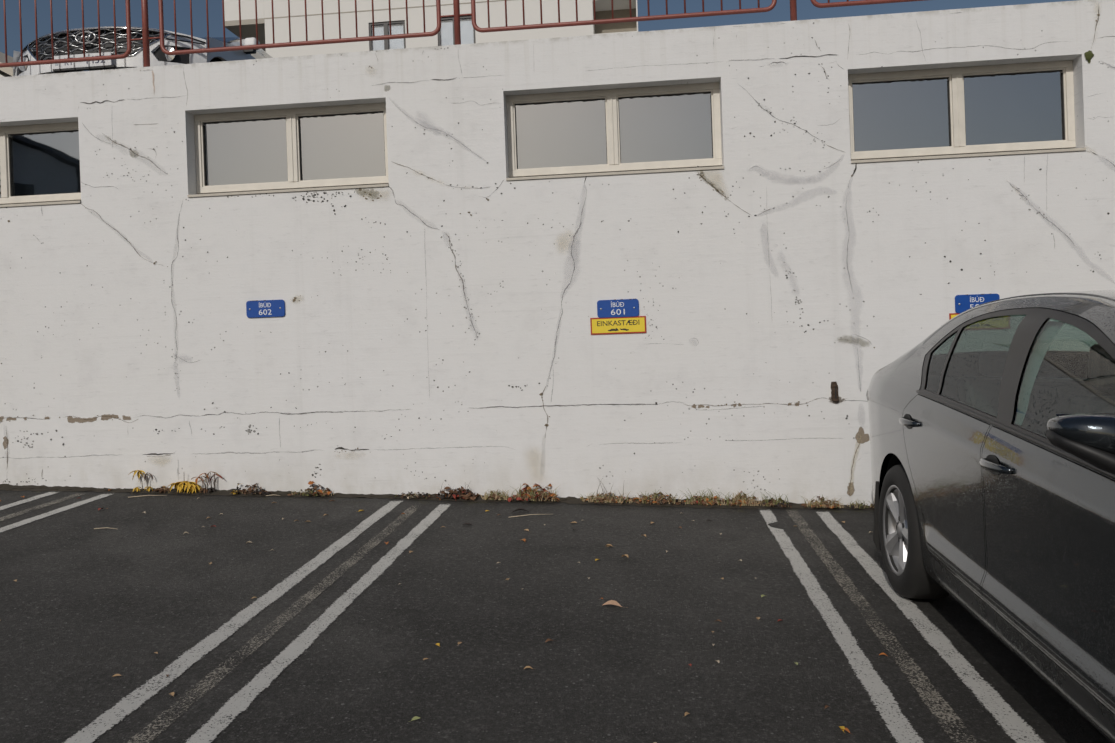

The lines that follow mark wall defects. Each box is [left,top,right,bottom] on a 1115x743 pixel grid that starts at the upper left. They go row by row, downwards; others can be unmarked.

crack [78,77,188,173]
crack [80,183,409,433]
crack [377,47,462,98]
crack [388,116,515,345]
crack [486,176,666,434]
crack [734,87,879,302]
crack [748,9,1115,68]
crack [1012,186,1101,272]